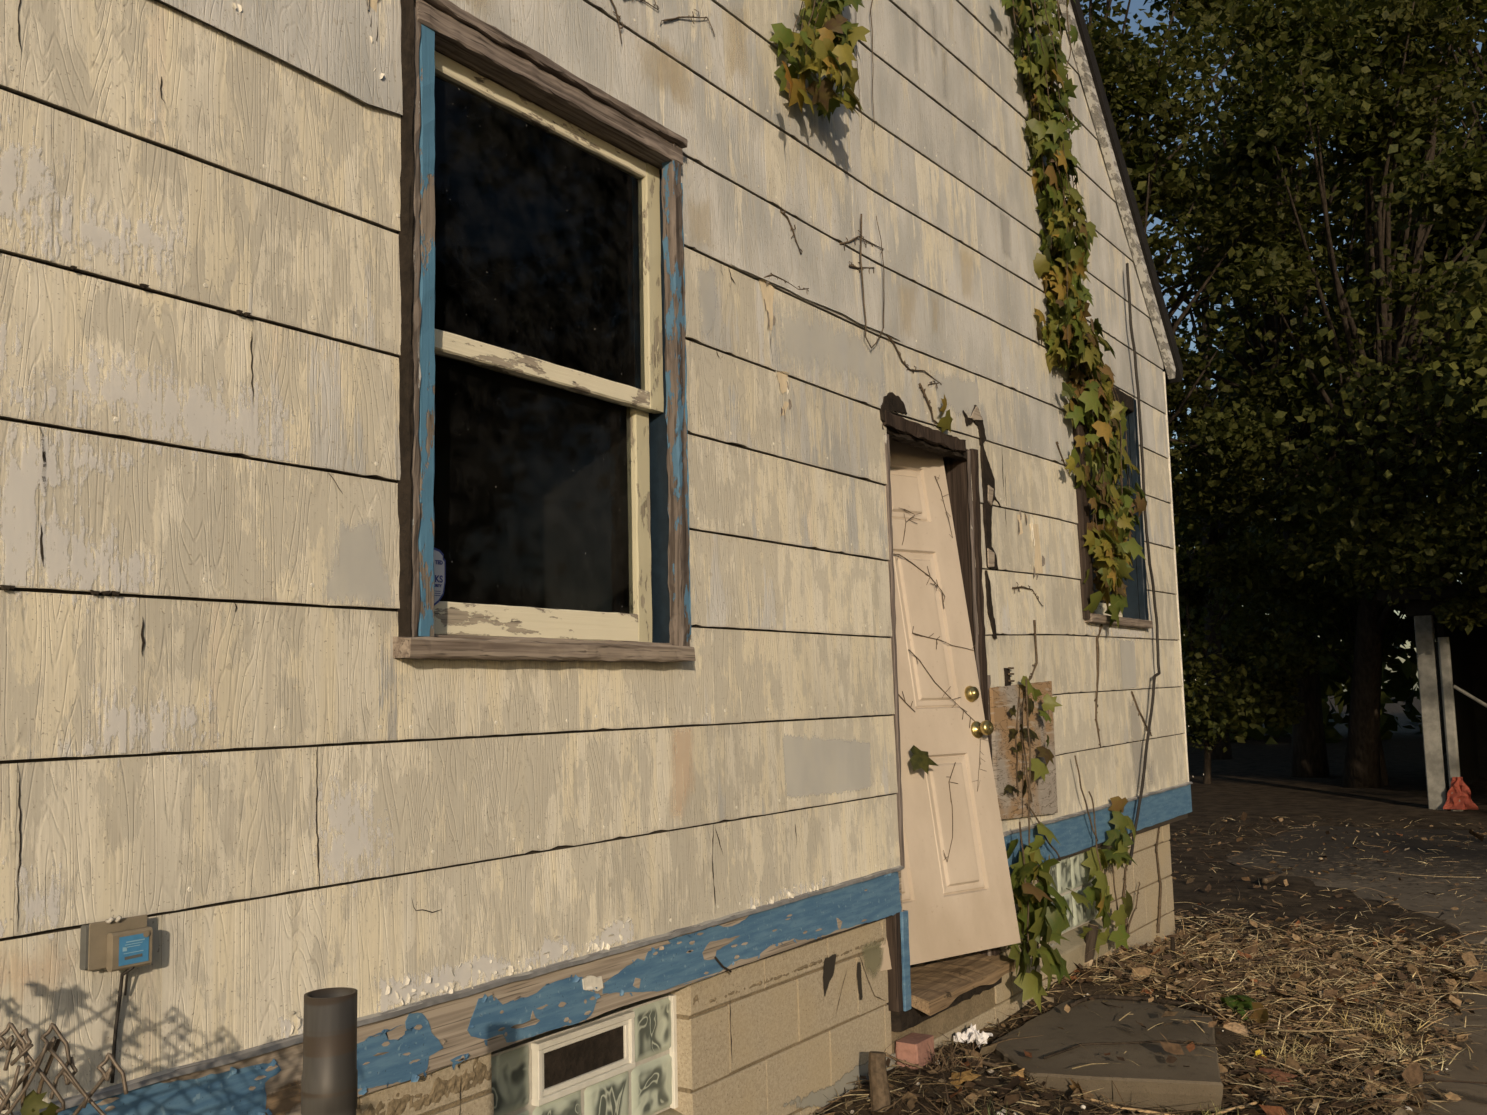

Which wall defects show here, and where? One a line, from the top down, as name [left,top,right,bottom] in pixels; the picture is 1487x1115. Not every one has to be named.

peeling [0,126,186,289]
peeling [759,277,776,330]
peeling [0,344,297,614]
peeling [1017,510,1045,580]
peeling [76,684,219,769]
peeling [2,860,72,939]
peeling [357,872,903,1095]
peeling [280,1011,303,1039]
peeling [58,1059,281,1115]
spalling [783,1053,896,1108]